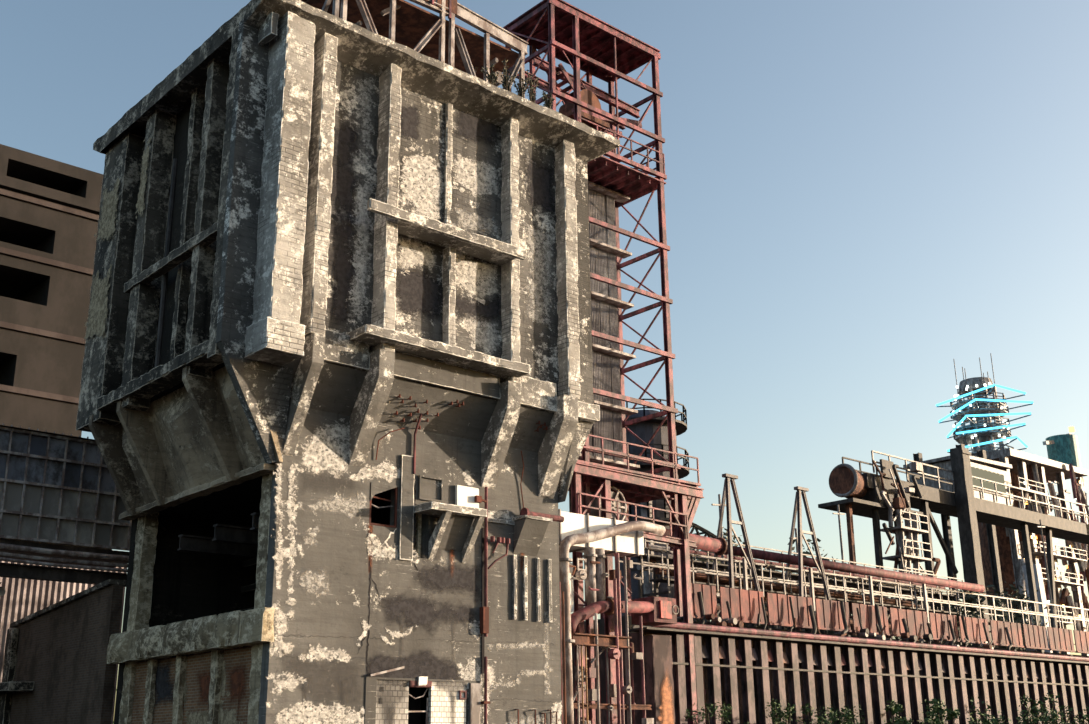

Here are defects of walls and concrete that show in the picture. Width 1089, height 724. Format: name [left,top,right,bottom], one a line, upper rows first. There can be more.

damp [455,110,501,144]
peeling [398,146,502,234]
peeling [365,529,420,564]
peeling [265,418,401,724]
peeling [381,626,417,645]
damp [368,530,480,724]
damp [290,660,356,705]